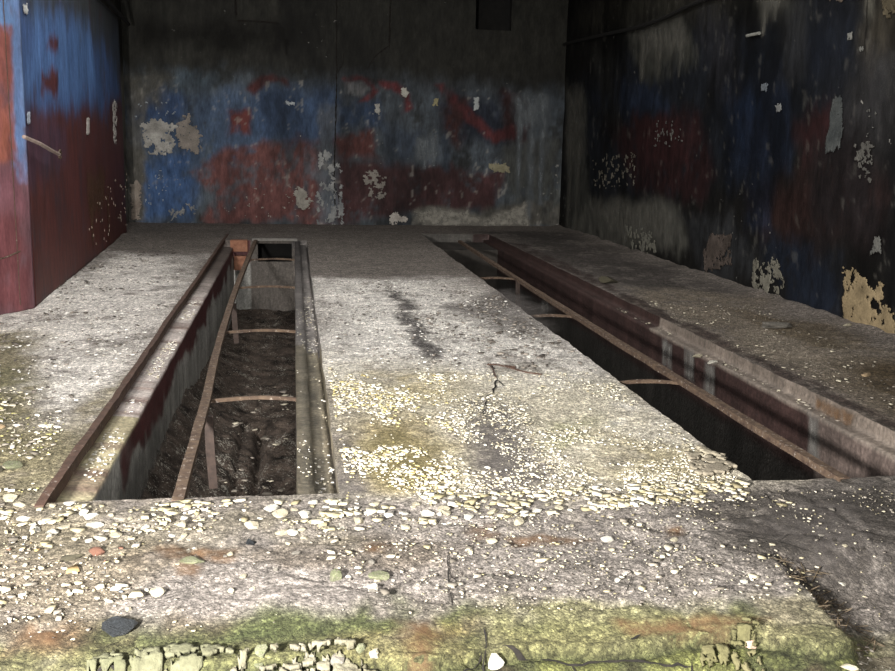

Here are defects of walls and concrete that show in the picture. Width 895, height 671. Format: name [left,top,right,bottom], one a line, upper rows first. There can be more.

peeling [135,101,203,156]
peeling [825,95,844,154]
peeling [284,150,344,225]
peeling [363,170,387,199]
peeling [389,212,408,225]
flaking render [0,170,188,459]
damp [386,290,444,358]
crack [472,363,504,416]
spalling [0,233,895,640]
spalling [86,637,379,671]
crack [463,628,693,671]